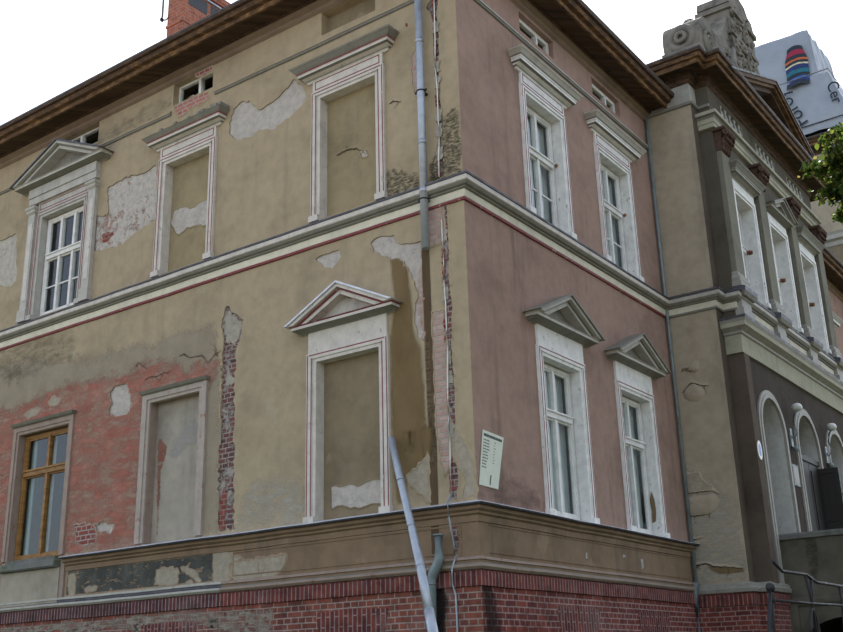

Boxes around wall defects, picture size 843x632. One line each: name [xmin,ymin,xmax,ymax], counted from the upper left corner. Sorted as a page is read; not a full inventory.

spalling [229,79,307,140]
spalling [94,165,157,251]
spalling [0,234,17,287]
crack [136,346,221,382]
spalling [371,235,479,504]
peeling [0,306,243,564]
peeling [330,477,381,512]
peeling [66,552,288,597]